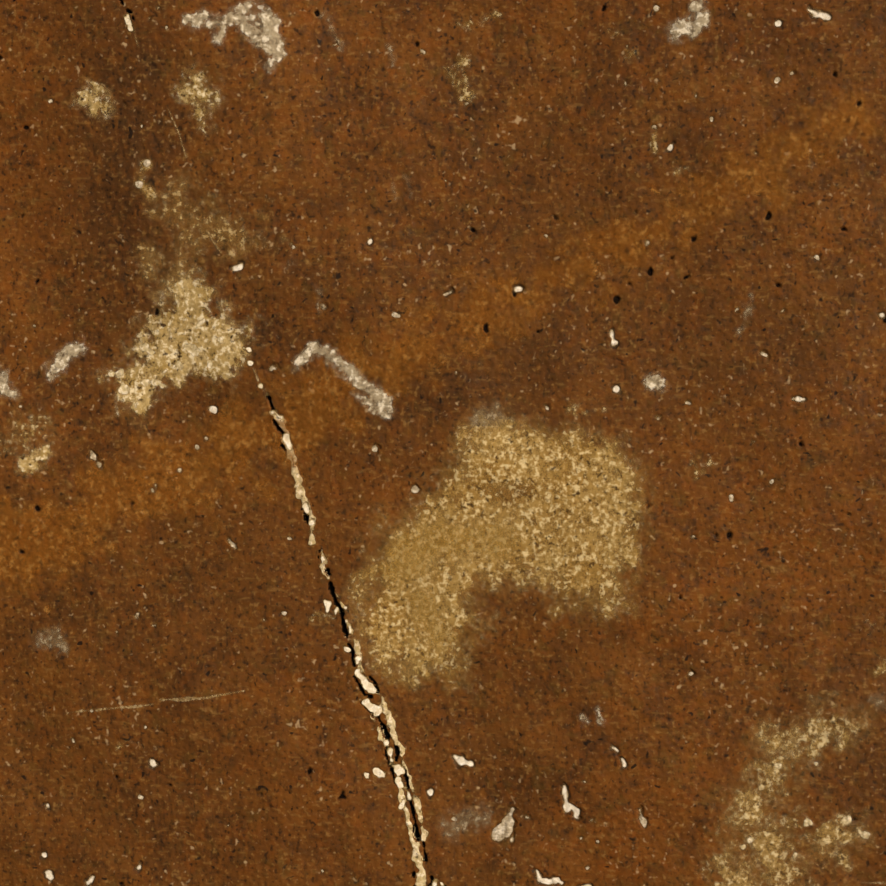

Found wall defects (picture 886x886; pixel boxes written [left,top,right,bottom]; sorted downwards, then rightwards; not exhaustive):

crack [119,0,137,41]
crack [242,347,446,886]